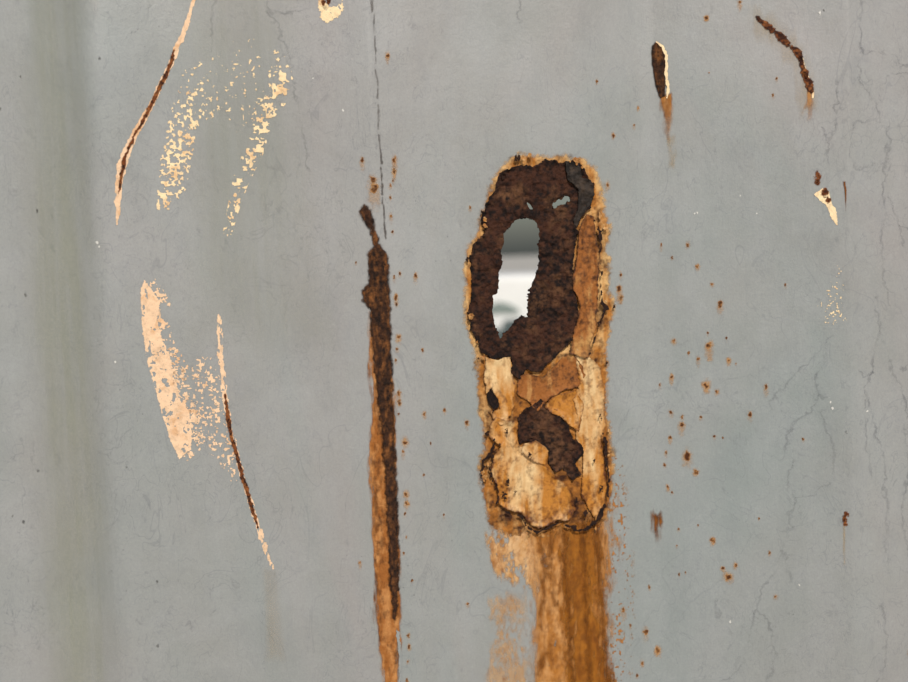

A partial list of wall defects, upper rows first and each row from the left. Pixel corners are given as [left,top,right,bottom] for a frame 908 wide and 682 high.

peeling [156,50,293,236]
rust [651,41,672,130]
peeling [814,171,838,225]
peeling [140,279,240,481]
rust [359,204,410,682]
rust [463,152,632,682]
rust [652,513,662,535]